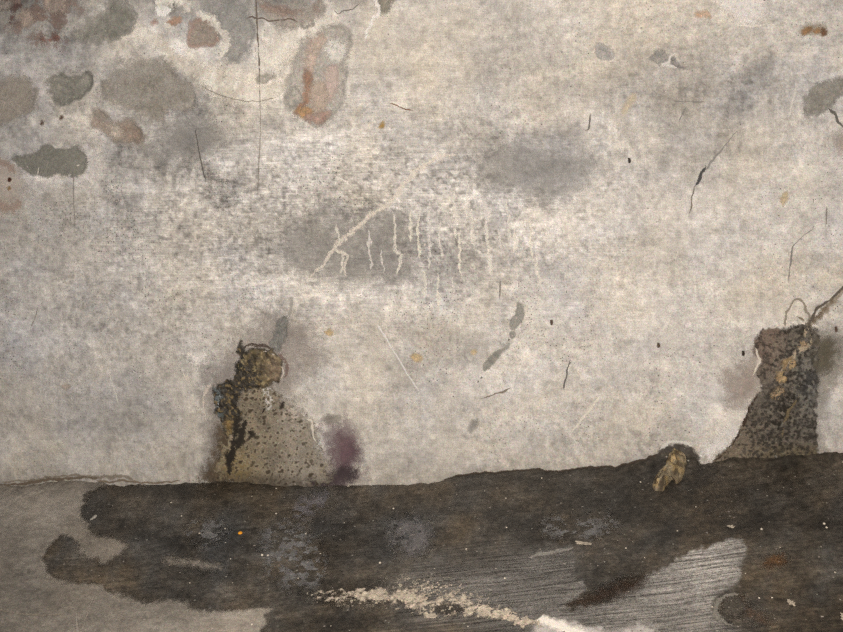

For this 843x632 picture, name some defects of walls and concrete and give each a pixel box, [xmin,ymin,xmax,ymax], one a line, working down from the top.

leakage [392,211,403,274]
leakage [408,202,443,307]
leakage [452,185,518,294]
crack [784,208,843,330]
leakage [42,324,843,632]